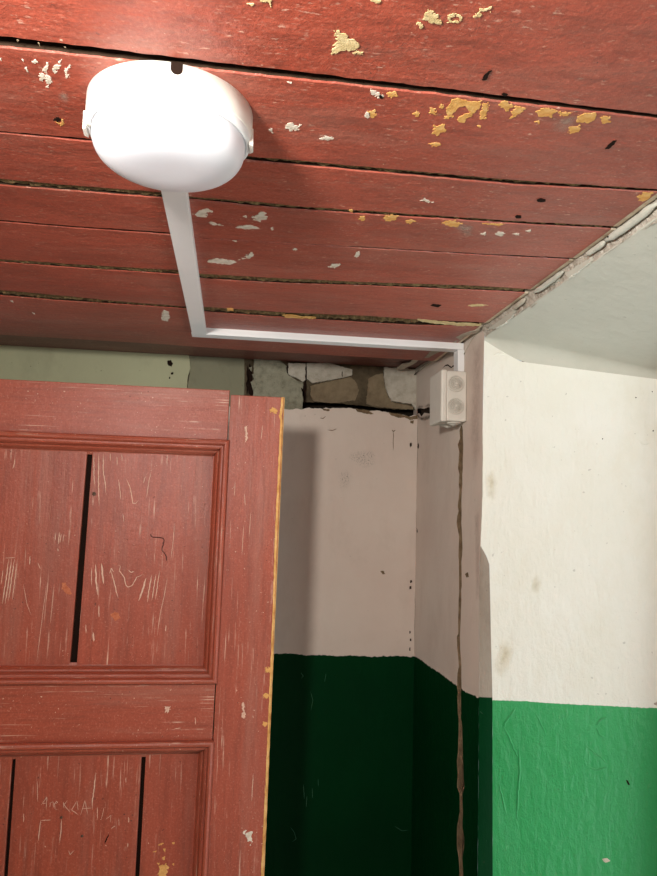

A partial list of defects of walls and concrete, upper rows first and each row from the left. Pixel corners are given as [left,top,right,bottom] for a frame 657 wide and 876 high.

peeling [416,6,492,29]
peeling [331,30,363,55]
peeling [22,59,71,88]
peeling [370,90,398,99]
peeling [412,93,611,147]
peeling [195,208,223,226]
peeling [235,212,274,230]
peeling [207,252,254,265]
flaking render [418,192,657,343]
flaking render [288,351,441,424]
crack [456,426,464,876]